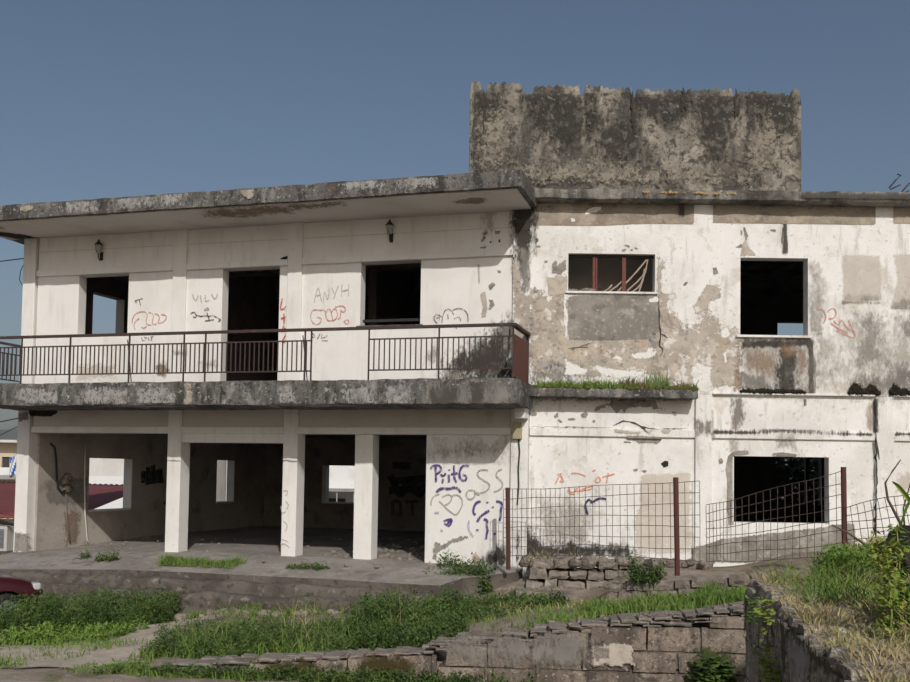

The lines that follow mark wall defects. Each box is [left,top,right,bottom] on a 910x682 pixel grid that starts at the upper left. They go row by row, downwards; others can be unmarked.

leakage [471,92,500,173]
leakage [520,92,799,166]
leakage [510,208,539,293]
flaking render [533,203,694,226]
leakage [184,383,193,404]
leakage [412,320,514,404]
peeling [477,265,495,318]
peeling [554,399,676,423]
peeling [512,257,744,393]
spalling [614,429,671,444]
crack [872,402,880,537]
leakage [855,315,910,393]